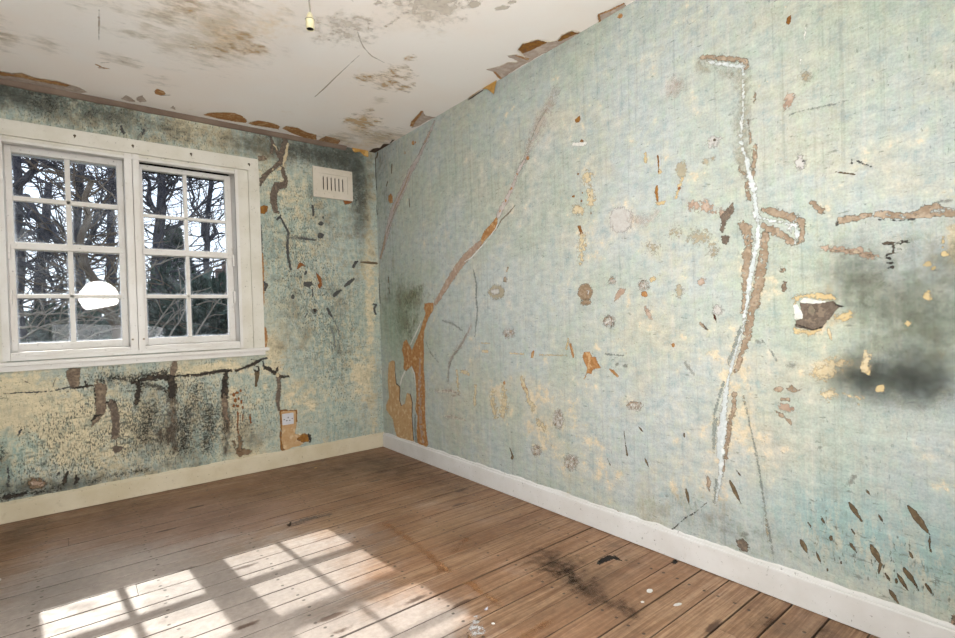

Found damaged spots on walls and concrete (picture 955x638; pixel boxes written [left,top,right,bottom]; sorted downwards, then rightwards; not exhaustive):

spalling [780,268,853,340]
water stain [0,446,149,502]
spalling [65,368,123,453]
water stain [232,435,253,457]
flaking render [279,409,312,451]
flaking render [386,361,414,441]
peeling [809,350,872,399]